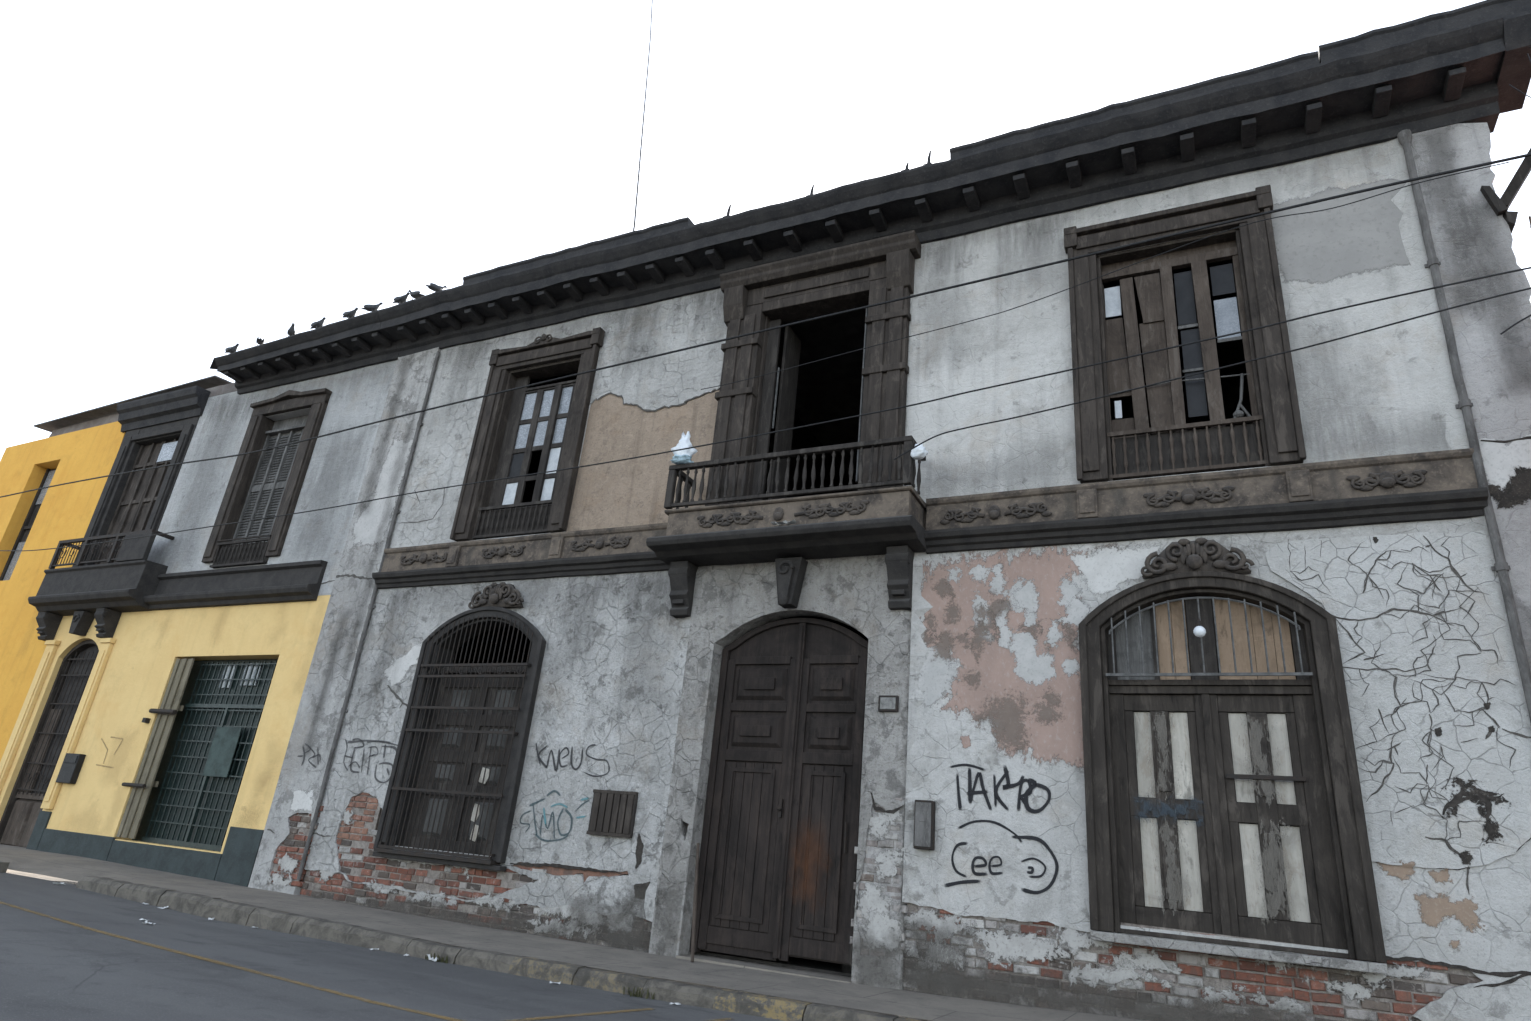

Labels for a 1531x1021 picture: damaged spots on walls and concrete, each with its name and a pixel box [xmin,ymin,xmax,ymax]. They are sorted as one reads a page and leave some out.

peeling [566,388,719,532]
peeling [1479,434,1531,509]
peeling [918,542,1161,768]
crack [1288,536,1531,893]
flaking render [267,788,656,952]
flaking render [850,793,1483,1021]
peeling [1377,777,1517,949]